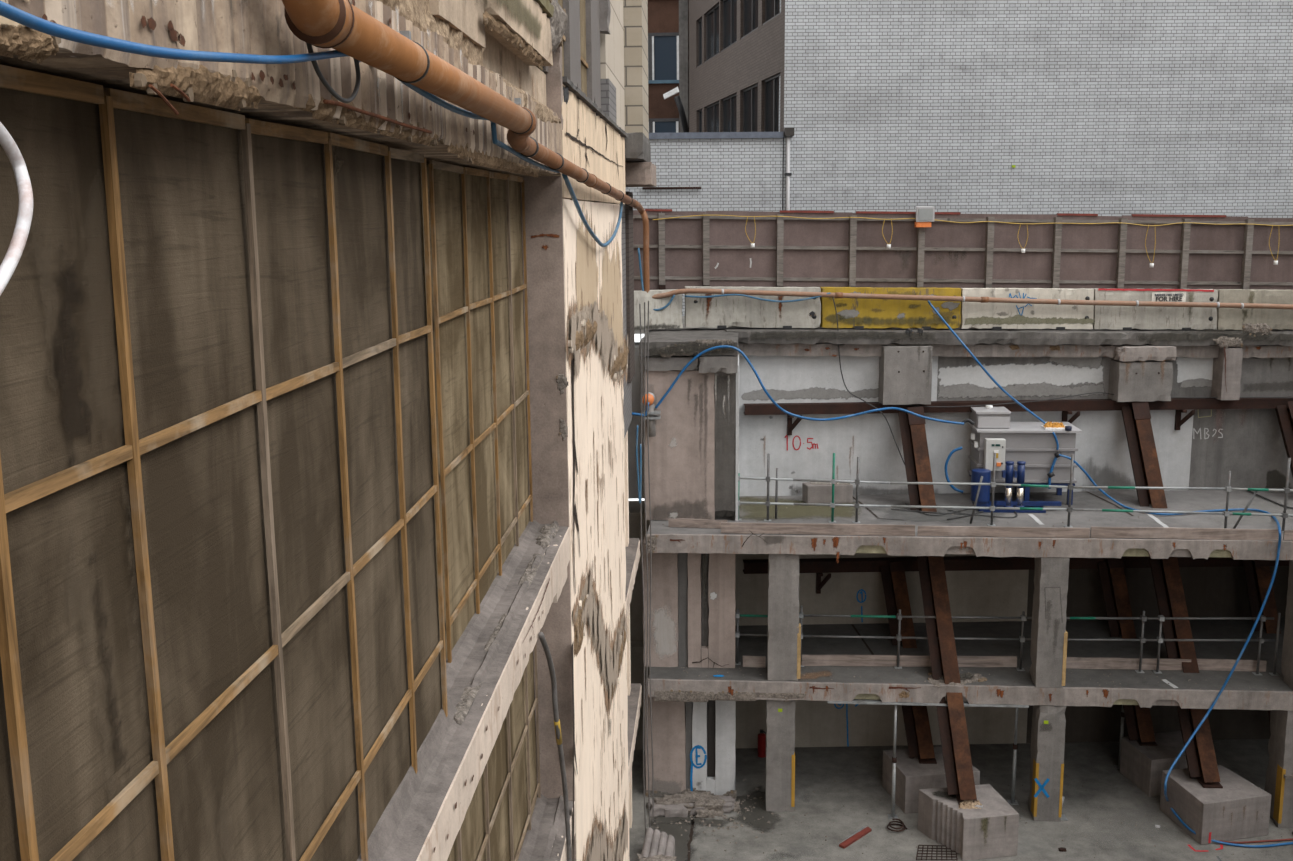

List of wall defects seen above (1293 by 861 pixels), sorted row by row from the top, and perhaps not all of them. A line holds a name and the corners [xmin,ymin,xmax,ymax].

spalling [0,24,61,64]
spalling [129,64,262,115]
peeling [568,206,629,396]
peeling [576,420,624,530]
spalling [573,525,627,861]